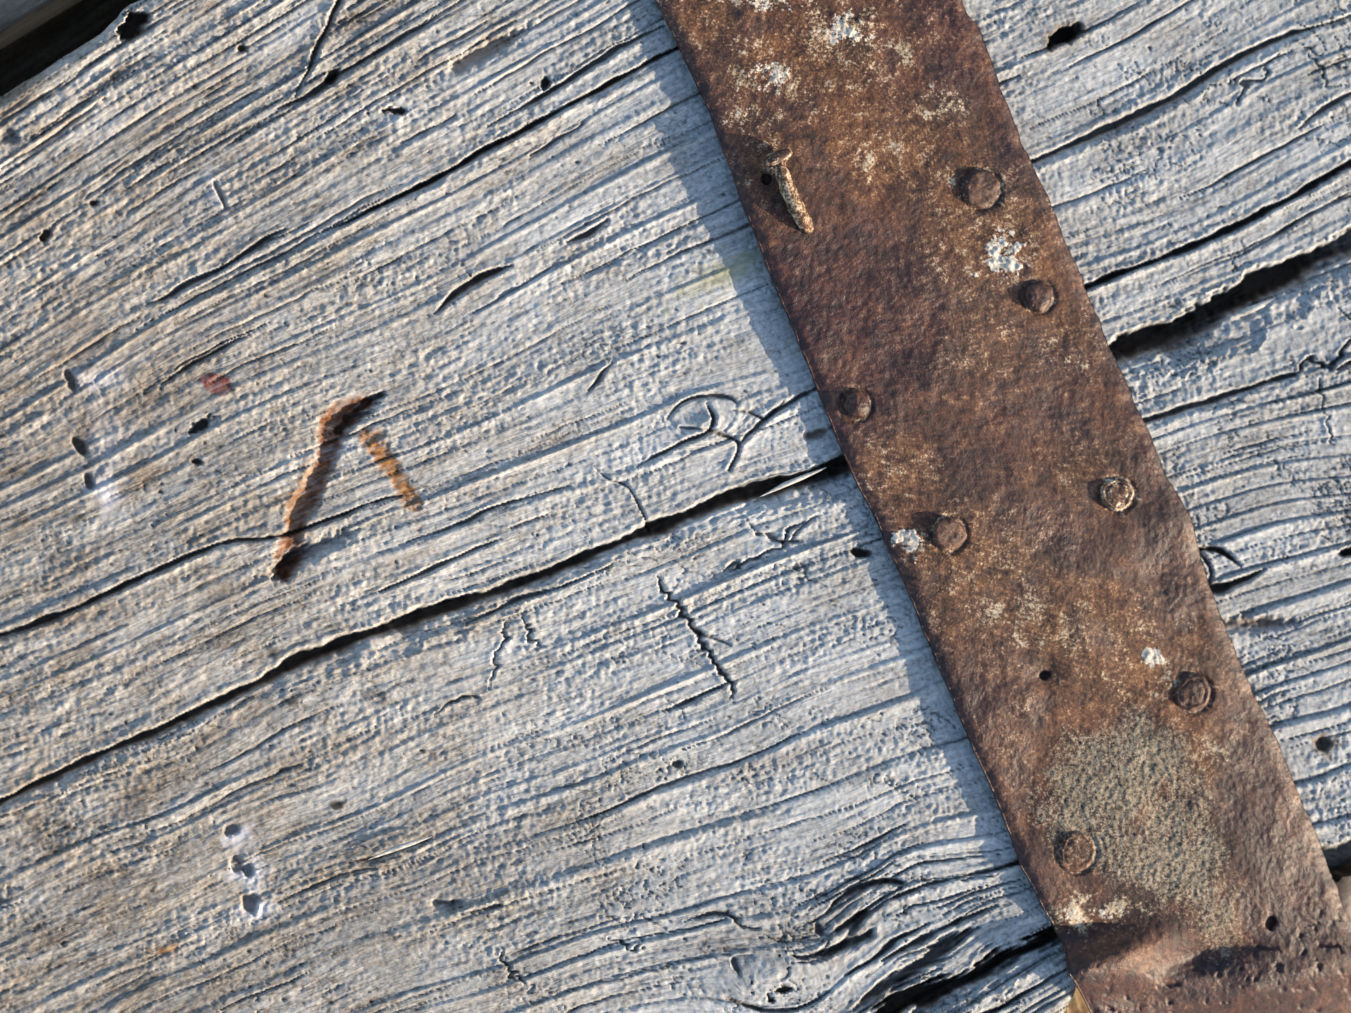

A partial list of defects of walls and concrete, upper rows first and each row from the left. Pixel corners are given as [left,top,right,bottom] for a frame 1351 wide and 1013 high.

crack [273,0,467,112]
crack [1084,156,1351,446]
corrosion [268,388,443,586]
crack [0,386,862,818]
corrosion [627,697,957,811]
crack [346,836,434,868]
crack [458,901,504,916]
crack [497,945,539,996]
crack [606,931,649,954]
crack [681,907,762,932]
crack [722,858,1066,1013]